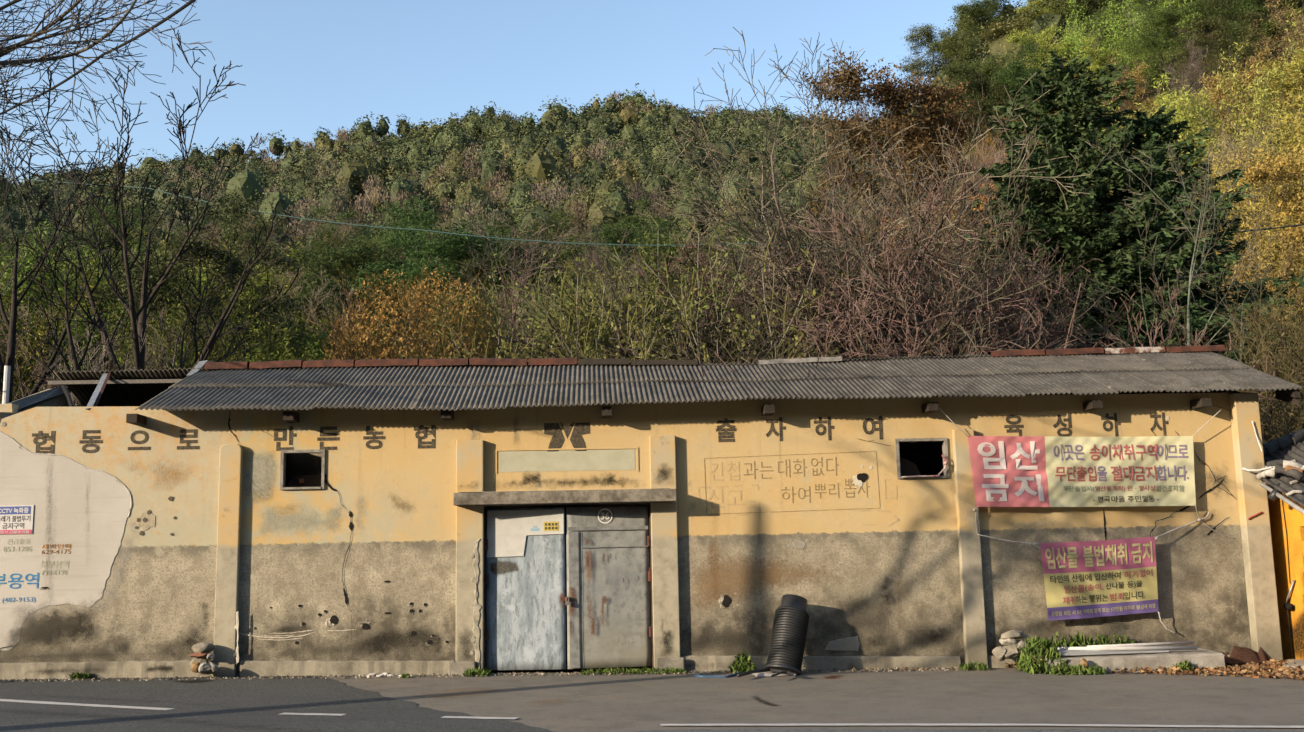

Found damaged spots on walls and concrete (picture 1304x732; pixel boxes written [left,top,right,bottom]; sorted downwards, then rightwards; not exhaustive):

spalling [135,510,156,535]
crack [325,474,354,639]
damp [13,612,93,672]